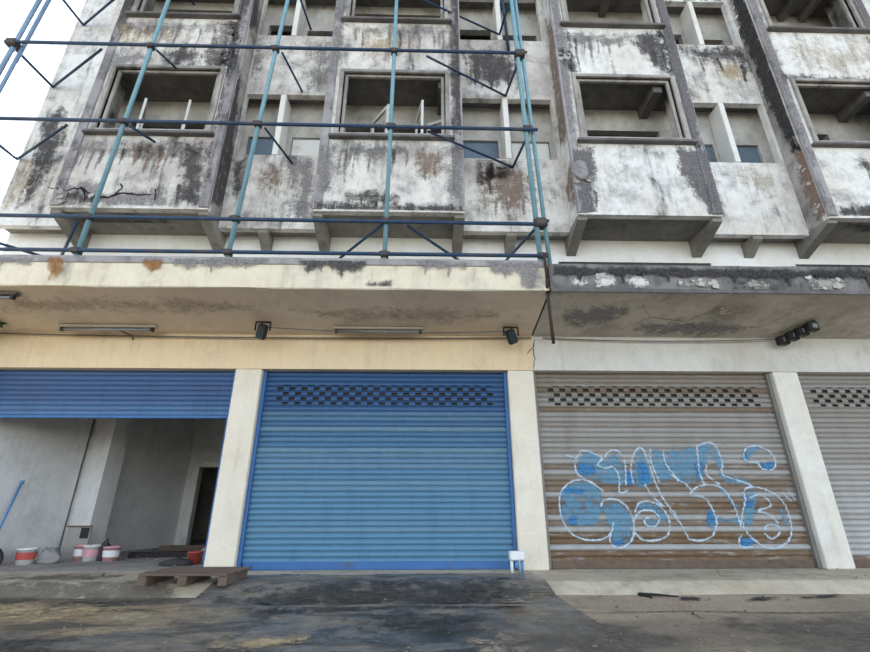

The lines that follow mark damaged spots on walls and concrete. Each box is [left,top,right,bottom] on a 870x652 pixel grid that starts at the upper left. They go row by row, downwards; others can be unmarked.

water stain [306,0,516,135]
water stain [6,0,262,223]
water stain [545,0,815,214]
crack [48,183,156,202]
water stain [258,143,464,223]
rust [48,257,63,280]
rust [143,259,162,271]
water stain [300,260,366,277]
peeling [571,273,651,287]
peeling [678,277,719,288]
water stain [554,265,870,286]
peeling [805,275,846,290]